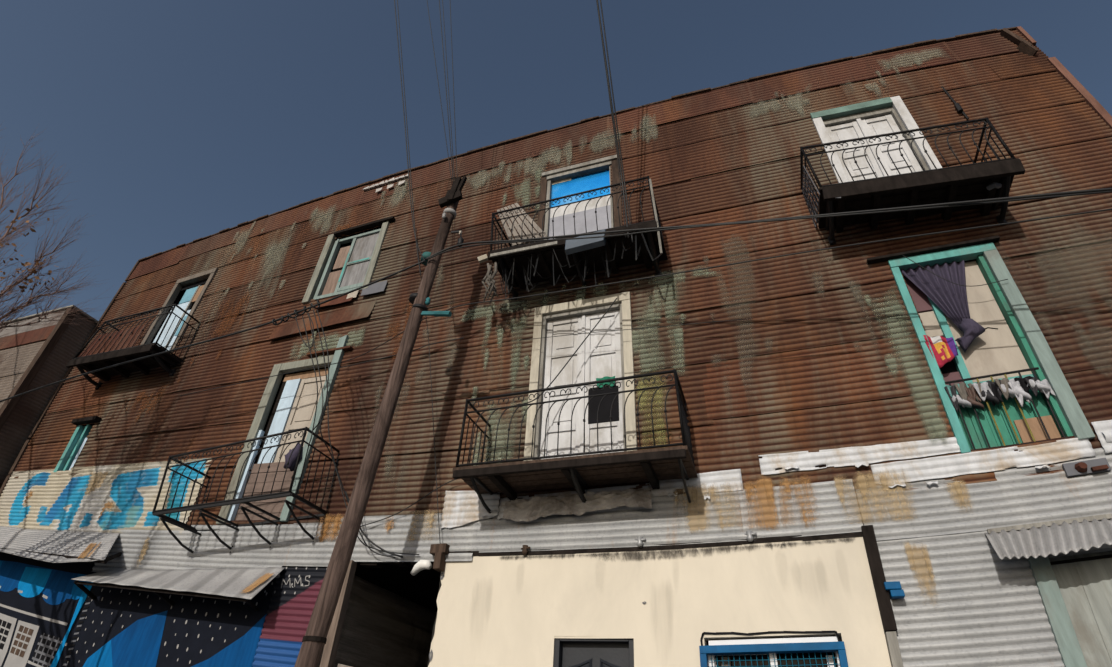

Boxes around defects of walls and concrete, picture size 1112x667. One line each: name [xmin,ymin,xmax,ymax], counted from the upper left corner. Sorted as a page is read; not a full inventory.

rust [306,345,354,358]
rust [85,472,108,494]
rust [674,486,733,531]
rust [745,479,814,528]
rust [835,472,911,520]
damp [501,541,811,560]
rust [905,543,934,592]